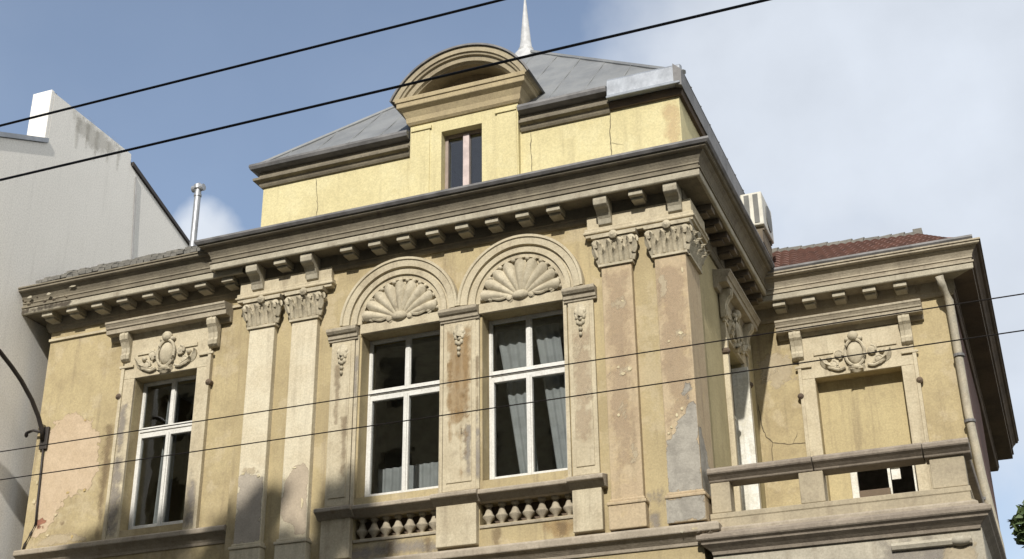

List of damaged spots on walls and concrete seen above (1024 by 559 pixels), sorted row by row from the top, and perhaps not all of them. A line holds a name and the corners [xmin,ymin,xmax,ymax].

flaking render [30,412,101,548]
peeling [234,467,263,544]
peeling [280,463,309,535]
damp [464,426,480,475]
flaking render [666,382,714,534]
crack [758,406,805,460]